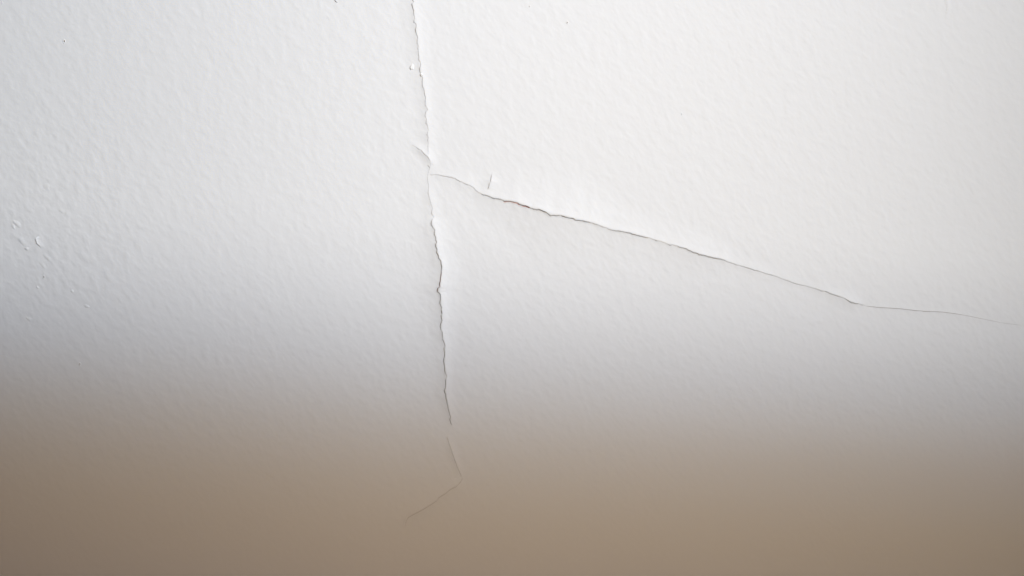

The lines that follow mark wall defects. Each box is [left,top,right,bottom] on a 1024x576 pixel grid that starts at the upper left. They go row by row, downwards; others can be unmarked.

crack [399,0,1024,527]